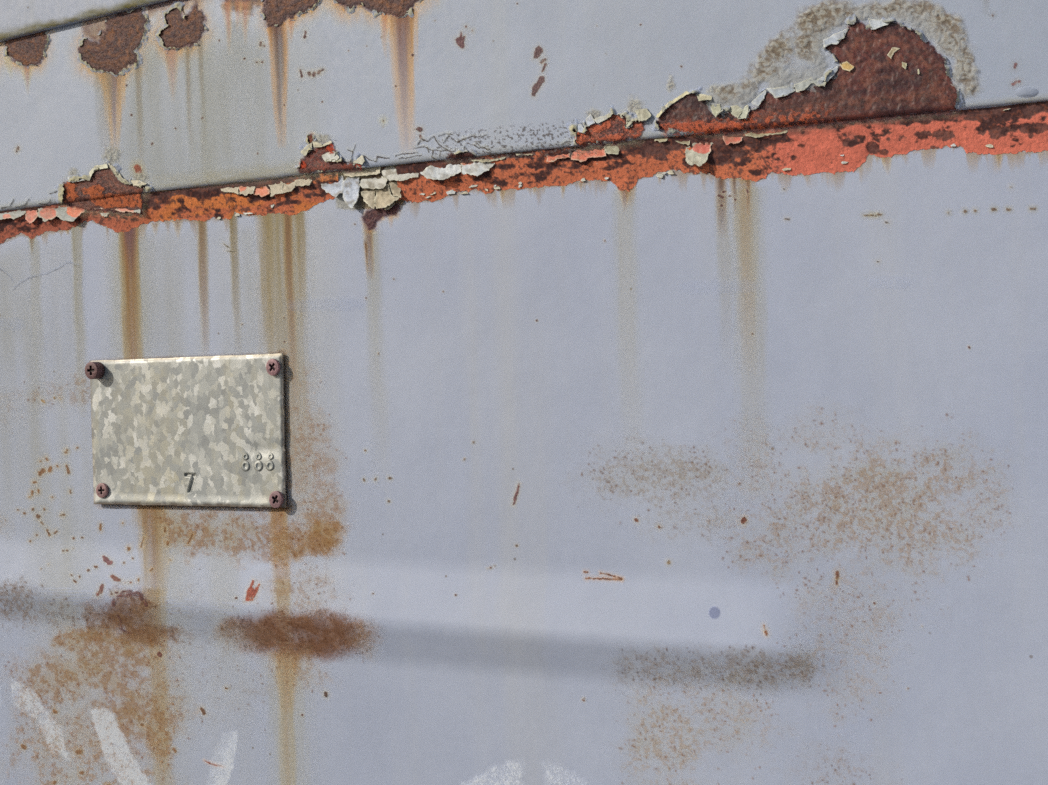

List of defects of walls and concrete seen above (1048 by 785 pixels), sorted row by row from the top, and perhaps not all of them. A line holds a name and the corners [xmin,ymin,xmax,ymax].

corrosion [4,30,51,72]
corrosion [77,0,209,116]
peeling [320,165,419,210]
spalling [435,124,595,161]
corrosion [354,14,1048,252]
corrosion [0,134,366,366]
corrosion [138,495,339,570]
corrosion [810,461,968,548]
corrosion [21,590,178,765]
corrosion [221,582,362,680]